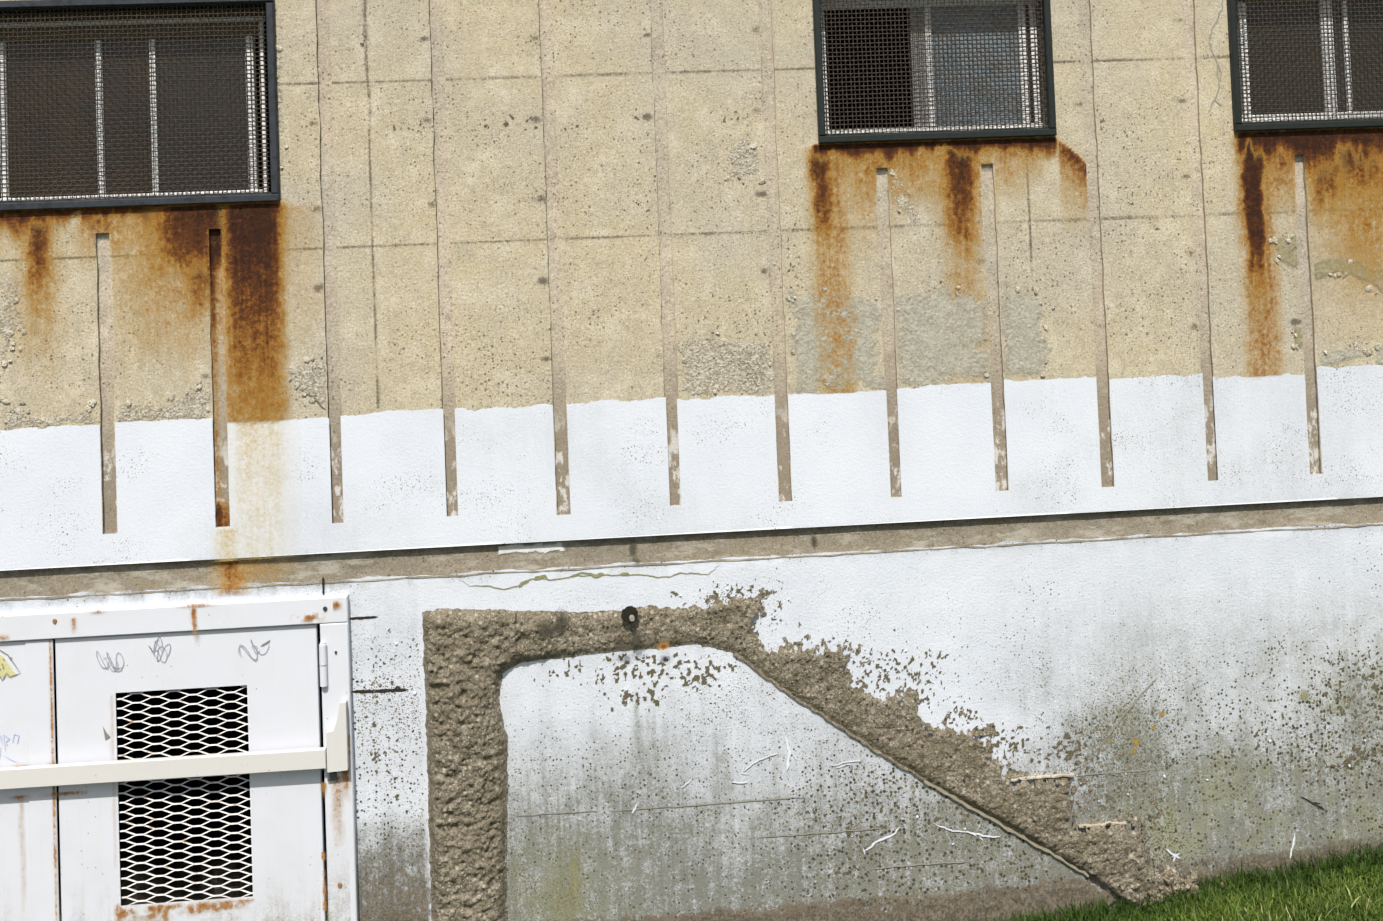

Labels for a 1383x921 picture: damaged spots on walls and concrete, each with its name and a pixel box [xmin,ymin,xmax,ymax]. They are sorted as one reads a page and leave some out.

rust [807,136,1088,390]
rust [1235,127,1383,376]
rust [0,201,288,594]
crack [459,566,718,590]
rust [187,604,208,632]
rust [322,735,350,807]
rust [52,786,83,906]
water stain [1154,835,1383,890]
rust [116,899,249,921]
water stain [676,878,1091,921]